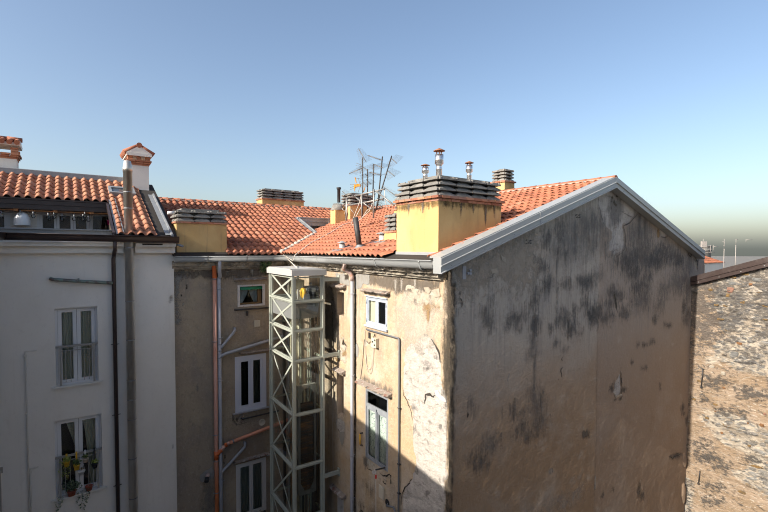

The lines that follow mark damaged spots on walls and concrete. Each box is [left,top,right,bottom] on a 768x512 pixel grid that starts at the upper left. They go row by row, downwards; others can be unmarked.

damp [510,277,627,344]
flaking render [401,334,448,512]